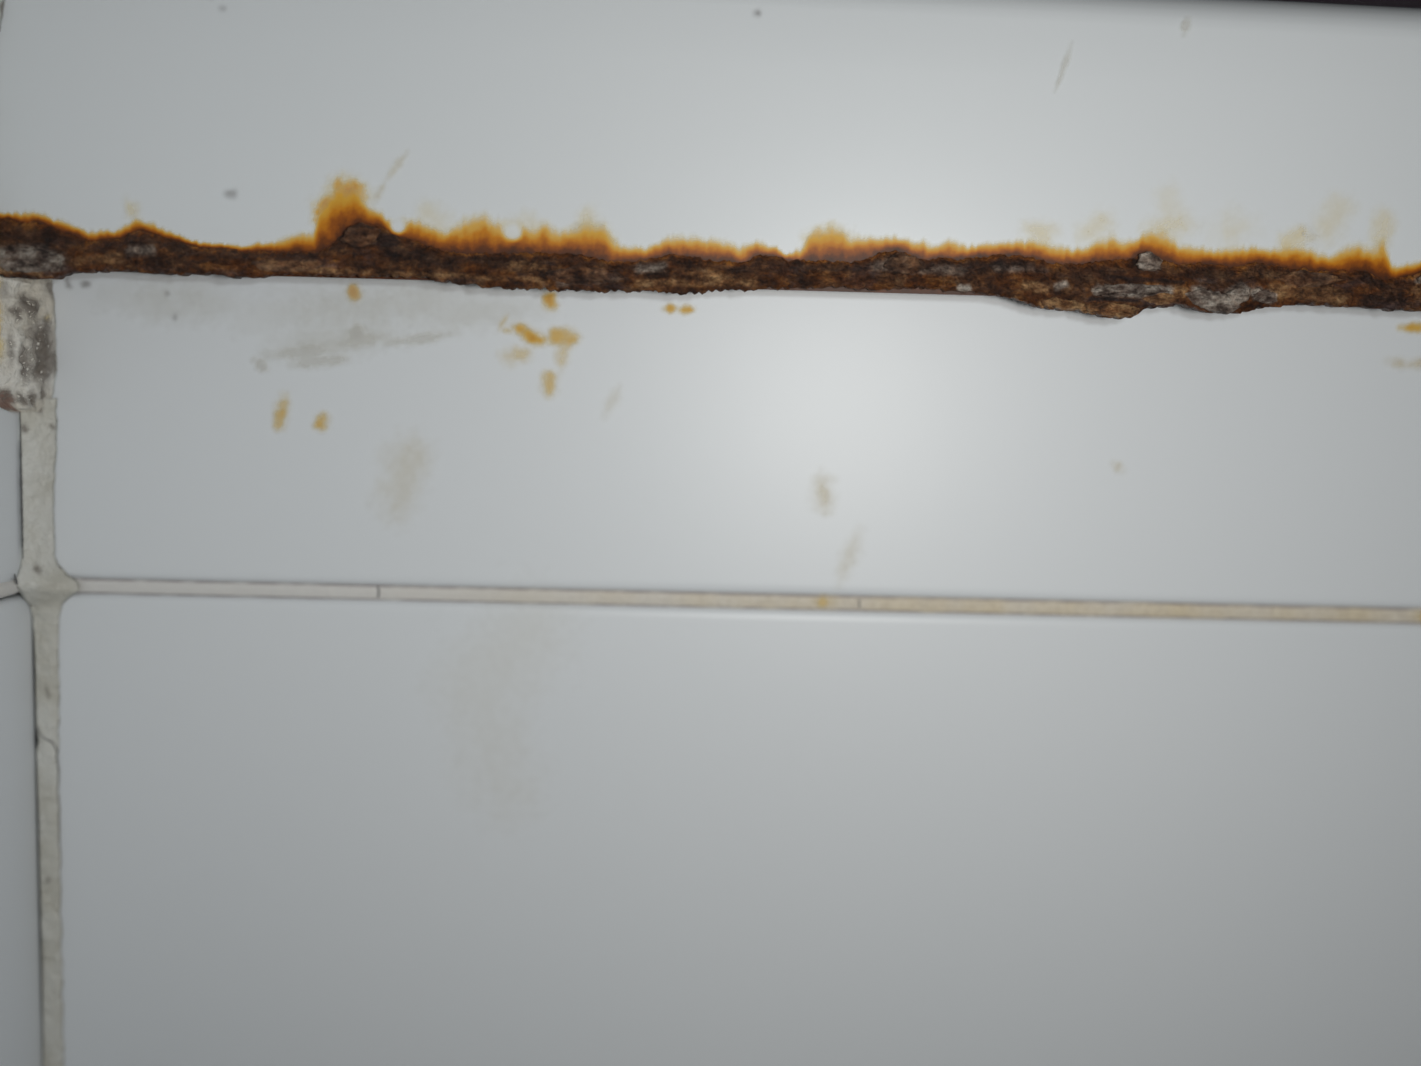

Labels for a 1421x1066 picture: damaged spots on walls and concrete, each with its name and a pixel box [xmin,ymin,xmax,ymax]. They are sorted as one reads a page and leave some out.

rust [0,179,1421,332]
rust [515,324,577,345]
rust [275,403,286,427]